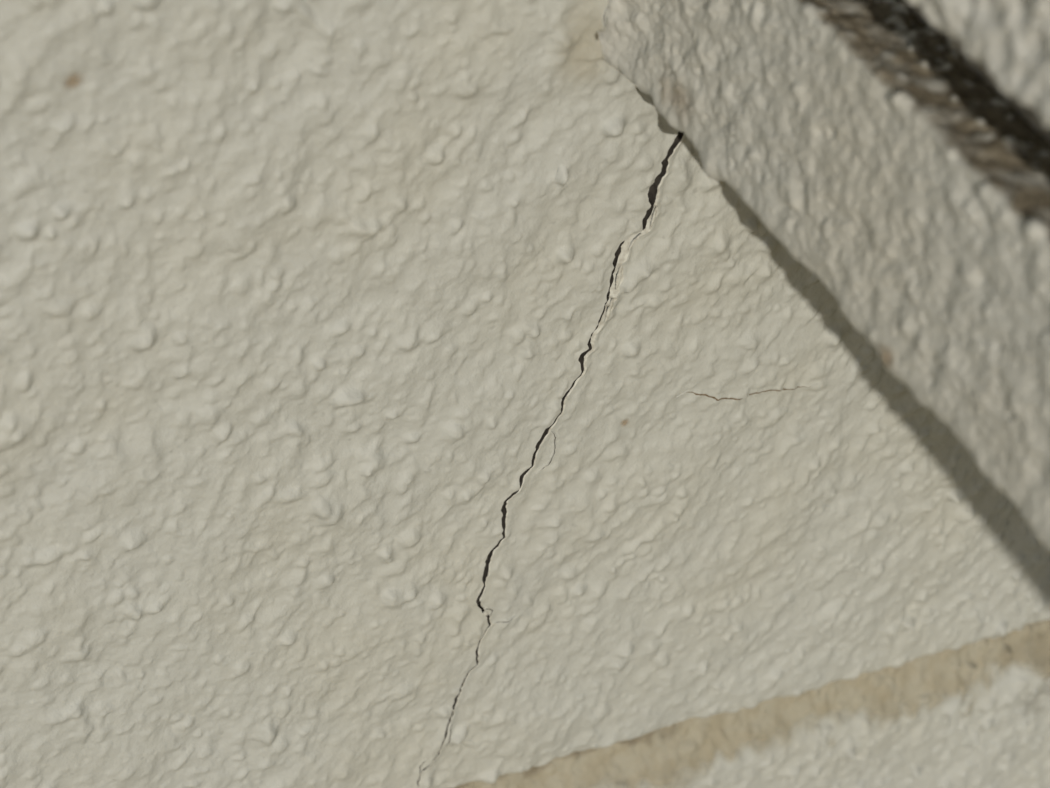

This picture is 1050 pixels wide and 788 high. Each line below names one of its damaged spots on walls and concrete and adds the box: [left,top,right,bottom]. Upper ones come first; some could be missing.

crack [417,131,685,787]